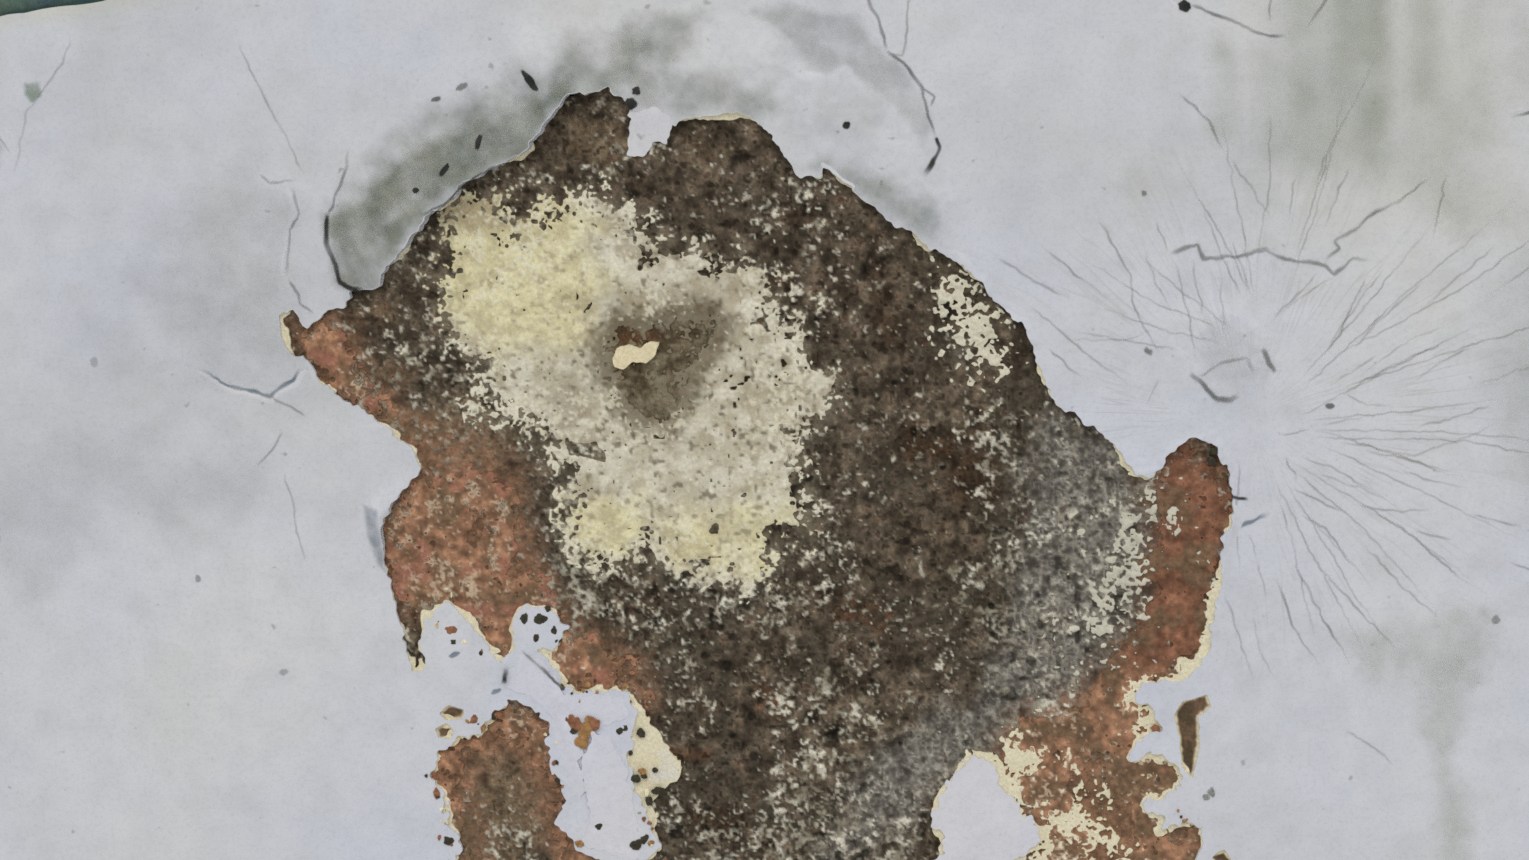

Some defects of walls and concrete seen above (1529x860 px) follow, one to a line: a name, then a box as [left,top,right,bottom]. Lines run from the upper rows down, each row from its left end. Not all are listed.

crack [1167,0,1227,19]
crack [859,0,941,170]
crack [1177,243,1346,275]
crack [1199,351,1275,402]
spalling [279,87,1233,860]
crack [1233,496,1259,526]